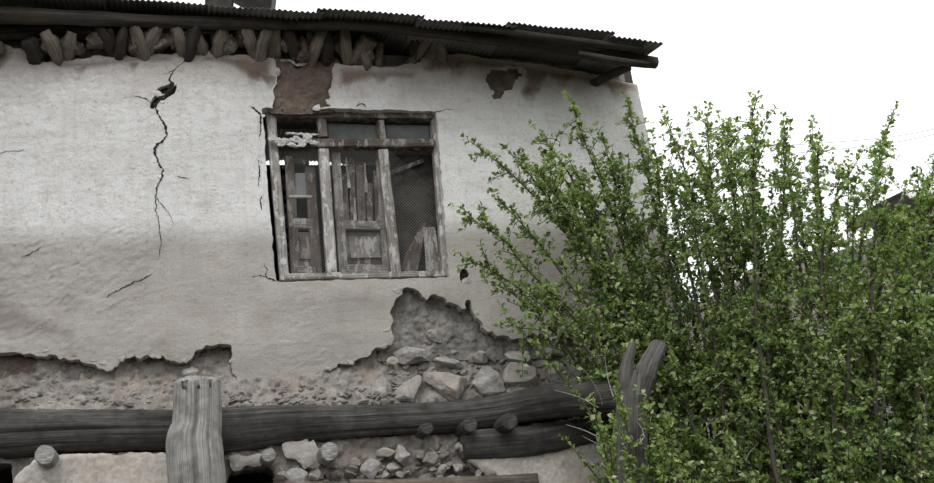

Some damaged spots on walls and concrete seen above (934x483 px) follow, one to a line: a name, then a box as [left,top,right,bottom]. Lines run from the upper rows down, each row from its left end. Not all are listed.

flaking render [268,57,340,117]
flaking render [486,65,525,99]
crack [106,63,185,298]
flaking render [377,286,558,365]
flaking render [0,349,78,379]
flaking render [117,353,165,365]
flaking render [180,347,235,364]